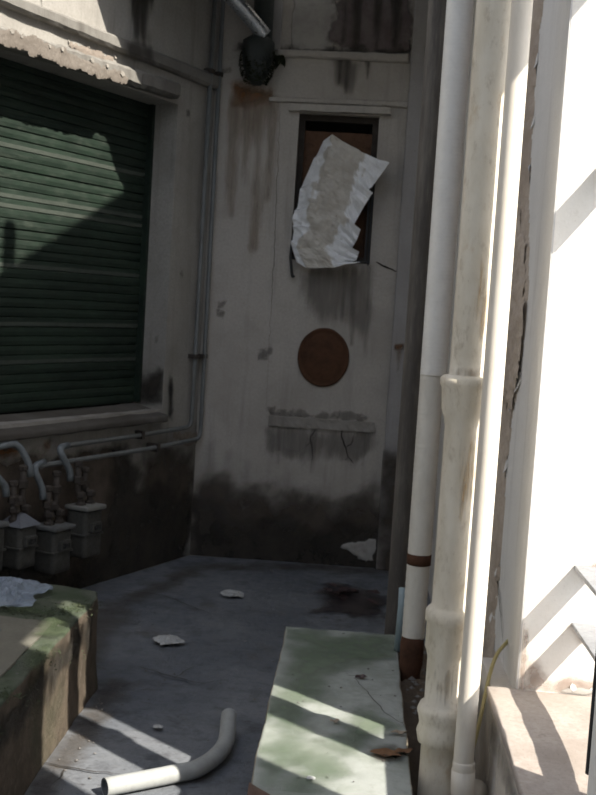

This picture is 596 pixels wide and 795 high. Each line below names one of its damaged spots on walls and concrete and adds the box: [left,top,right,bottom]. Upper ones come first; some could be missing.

flaking render [0,28,128,84]
leakage [324,0,413,87]
flaking render [482,0,544,658]
leakage [135,369,172,415]
leakage [0,446,397,589]
leakage [520,634,593,695]